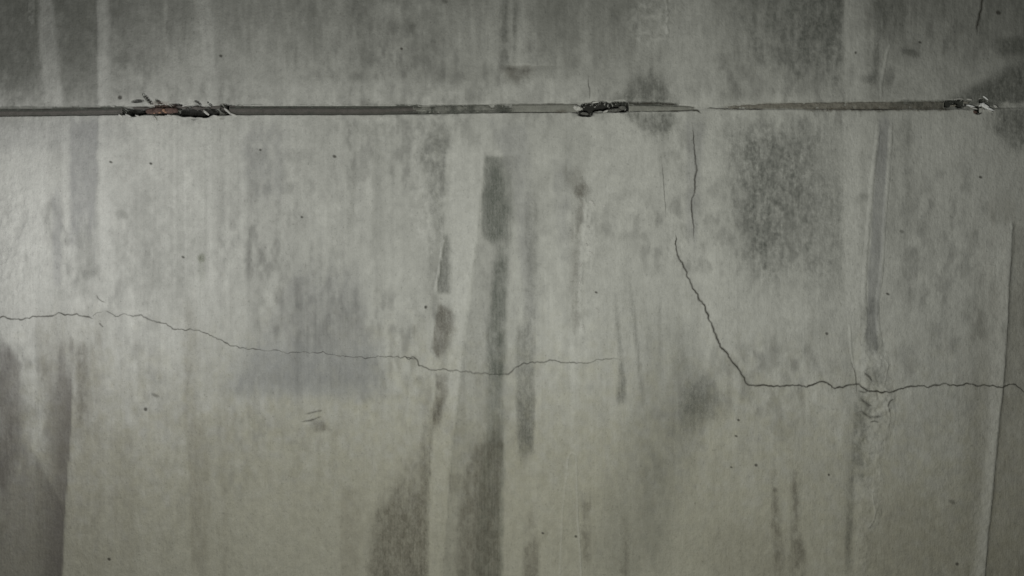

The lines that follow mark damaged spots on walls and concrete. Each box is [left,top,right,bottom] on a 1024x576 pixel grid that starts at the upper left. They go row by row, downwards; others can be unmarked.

spalling [118,93,237,121]
spalling [573,101,629,117]
spalling [944,96,998,114]
crack [627,102,1022,393]